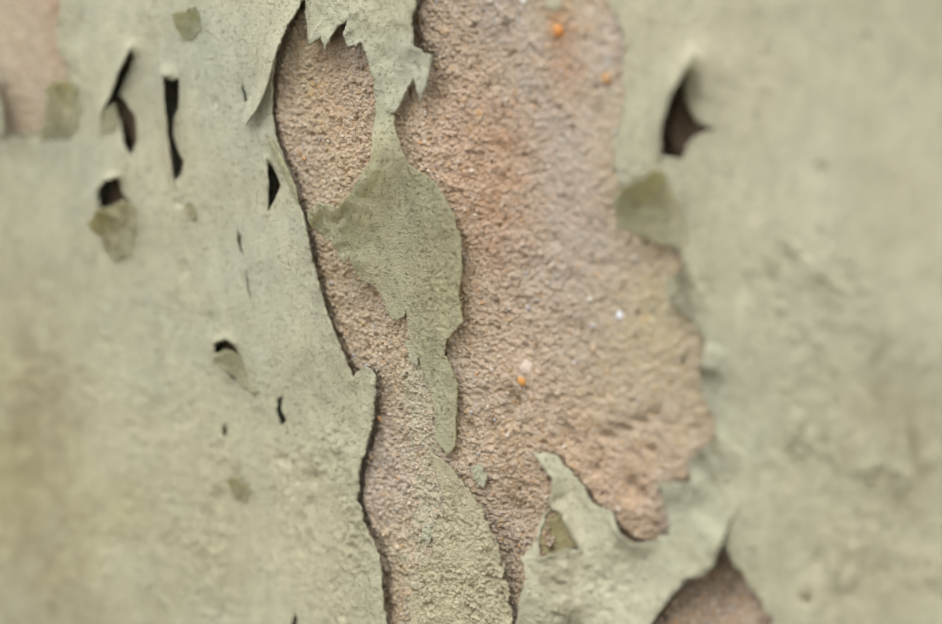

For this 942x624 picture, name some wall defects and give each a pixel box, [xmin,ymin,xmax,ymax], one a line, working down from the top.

peeling [171,6,202,40]
peeling [0,0,80,141]
peeling [101,96,137,148]
peeling [88,178,137,263]
peeling [242,0,717,624]
peeling [213,340,257,393]
peeling [653,543,773,624]